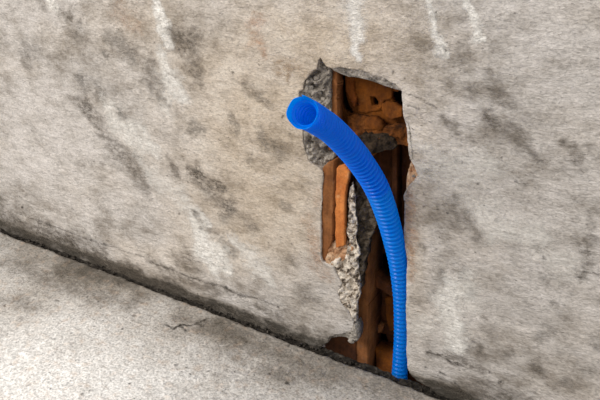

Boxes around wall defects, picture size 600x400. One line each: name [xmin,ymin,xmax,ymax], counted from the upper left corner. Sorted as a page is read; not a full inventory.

flaking render [300,61,403,120]
flaking render [303,130,337,166]
flaking render [406,123,418,190]
flaking render [325,182,364,344]
crack [0,228,455,400]